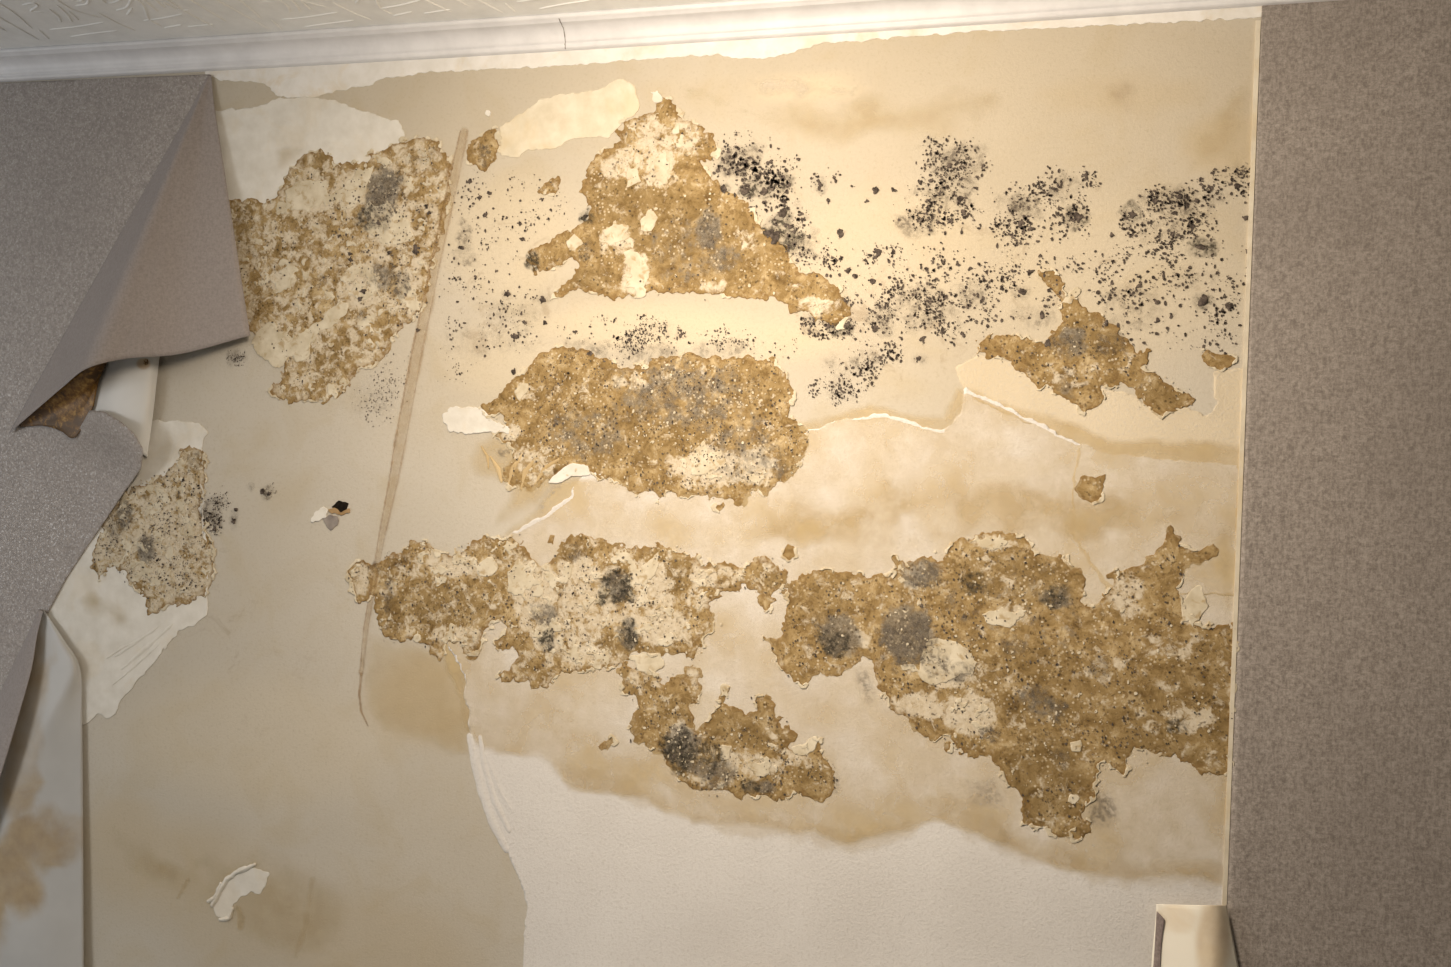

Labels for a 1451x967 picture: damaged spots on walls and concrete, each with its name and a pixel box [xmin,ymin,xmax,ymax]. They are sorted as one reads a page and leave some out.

spalling [90,445,217,616]
spalling [229,110,502,405]
damp [520,482,588,514]
spalling [478,344,809,513]
spalling [524,91,853,331]
damp [330,130,1250,427]
spalling [975,267,1196,420]
spalling [345,525,1240,843]
peeling [207,863,270,922]